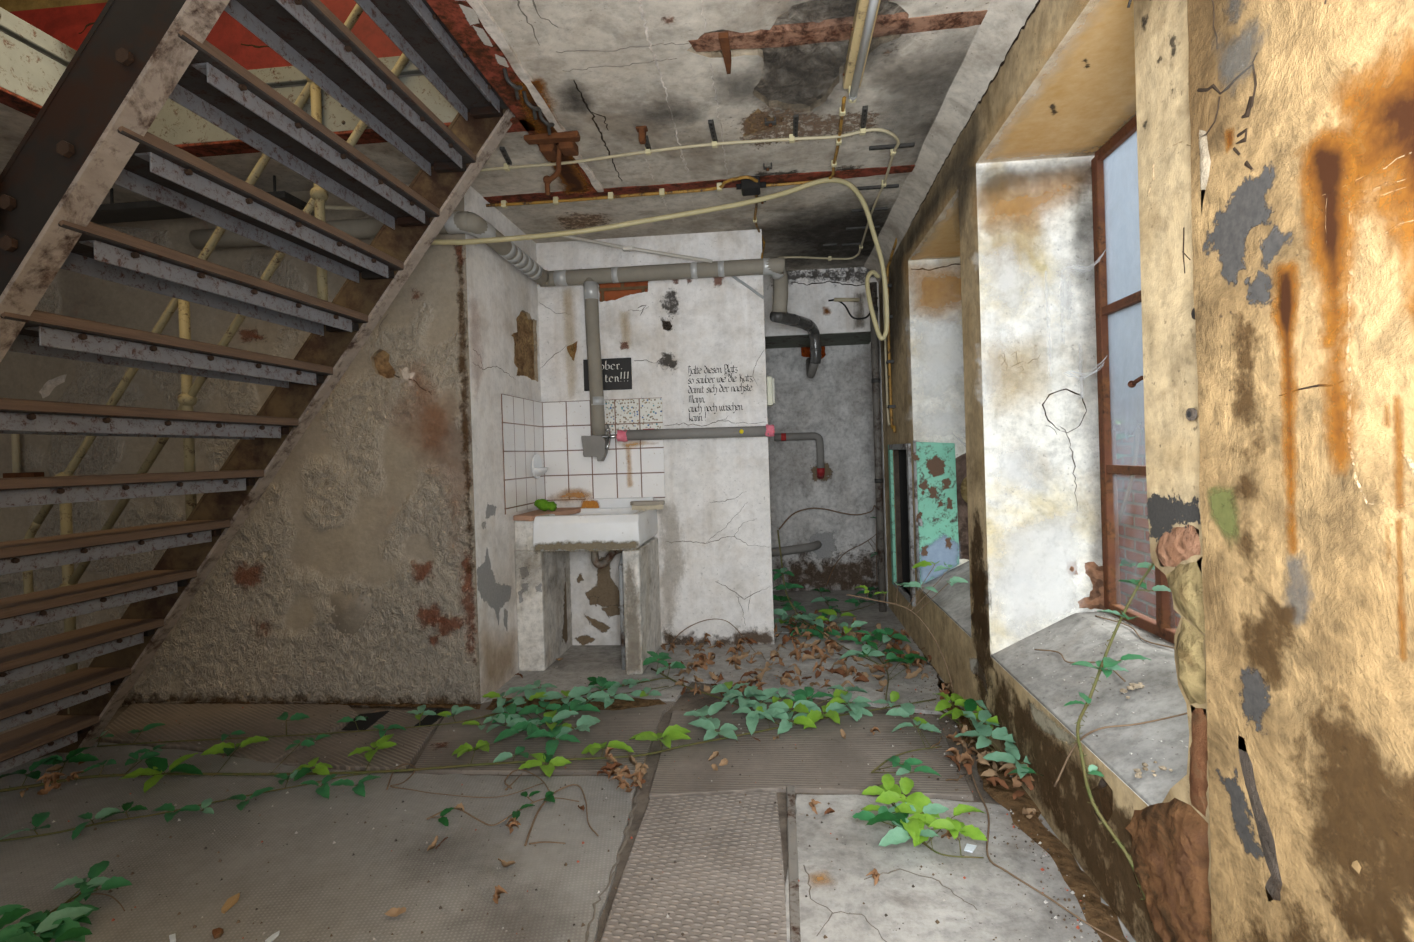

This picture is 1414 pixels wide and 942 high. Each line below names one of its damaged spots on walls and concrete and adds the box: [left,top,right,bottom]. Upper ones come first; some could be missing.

crack [517,0,689,180]
peeling [1203,161,1293,308]
rust [1301,42,1414,469]
spalling [512,312,535,380]
peeling [562,557,620,645]
crack [1042,388,1087,511]
rust [1272,263,1299,553]
rust [1386,399,1406,659]
spalling [1126,492,1282,942]
crack [803,865,887,942]
damp [1253,901,1316,942]
damp [1300,706,1414,942]